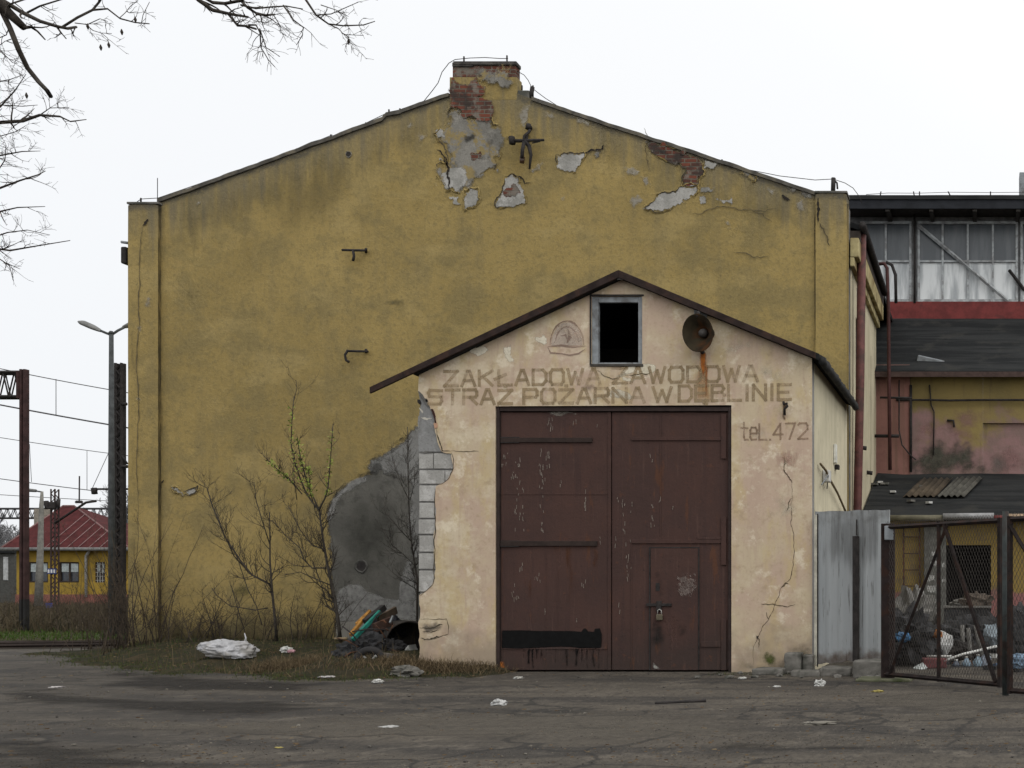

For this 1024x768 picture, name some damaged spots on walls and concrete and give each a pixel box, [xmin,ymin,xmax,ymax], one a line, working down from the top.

spalling [420,64,540,211]
spalling [555,145,604,174]
spalling [631,141,733,214]
crack [814,198,830,313]
spalling [417,391,472,596]
crack [753,459,795,664]
spalling [422,619,449,640]